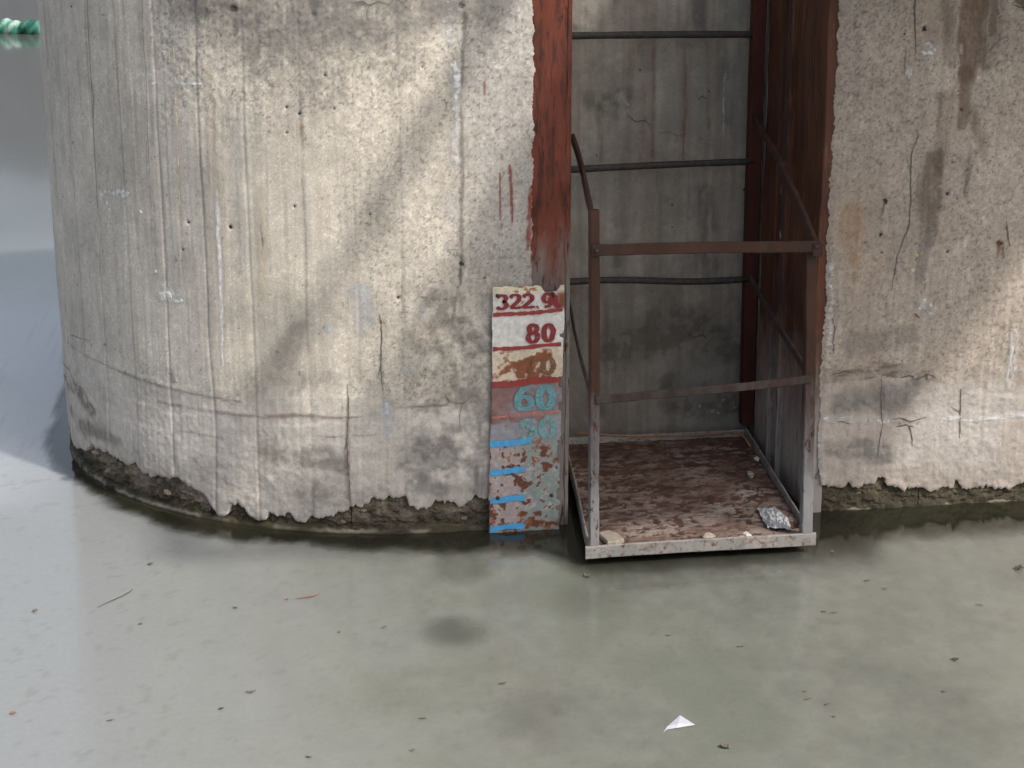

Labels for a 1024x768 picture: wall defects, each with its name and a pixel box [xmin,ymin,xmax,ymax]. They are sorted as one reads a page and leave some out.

crack [891,135,919,290]
spalling [69,427,216,516]
crack [343,396,351,505]
spalling [231,495,489,534]
crack [877,379,885,453]
spalling [821,477,1024,511]